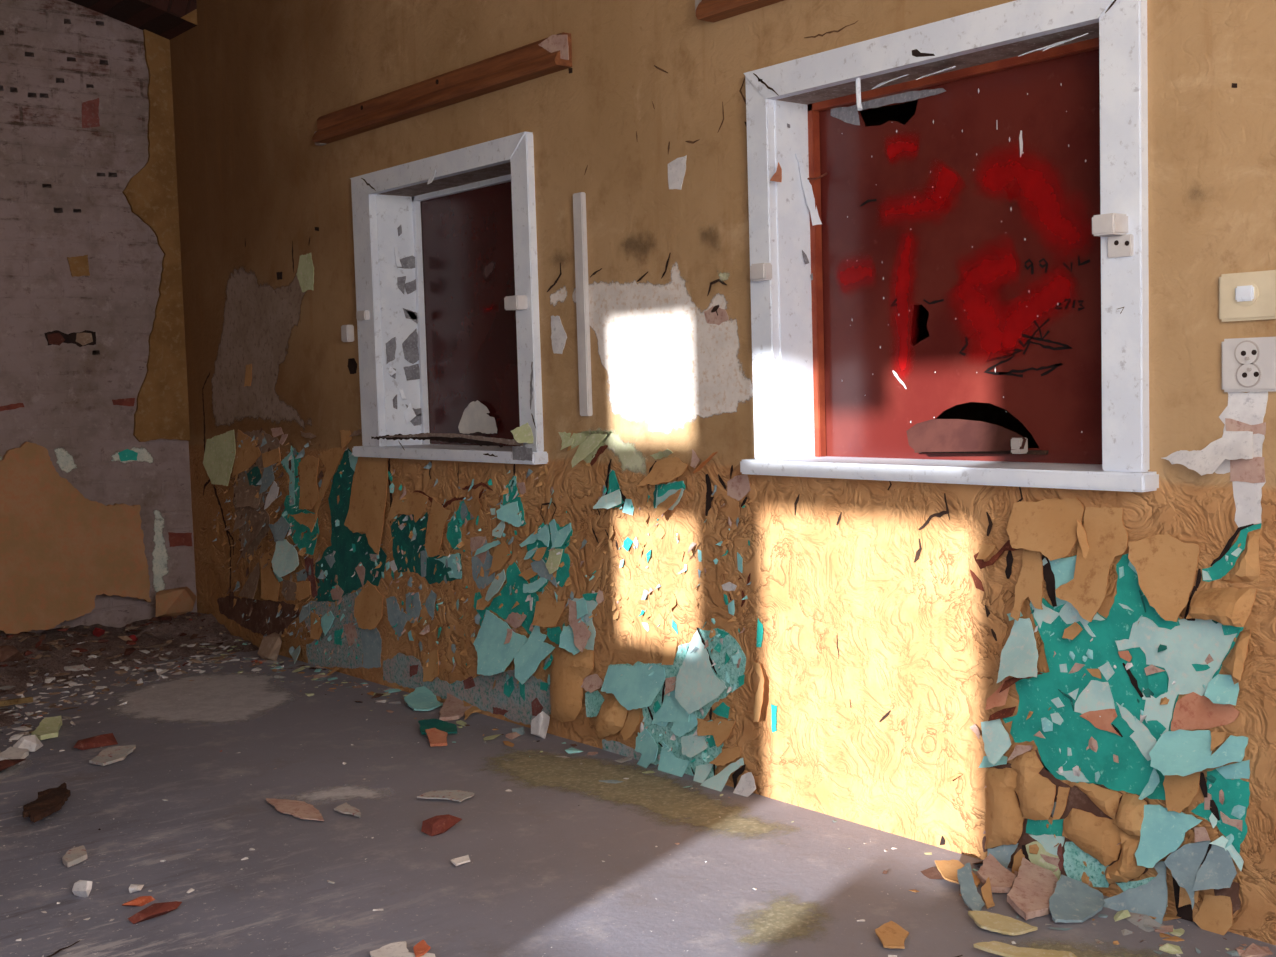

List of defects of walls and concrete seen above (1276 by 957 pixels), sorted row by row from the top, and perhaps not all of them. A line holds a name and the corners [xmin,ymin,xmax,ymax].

flaking render [81,98,100,128]
spalling [44,330,96,347]
peeling [54,448,77,473]
peeling [111,447,153,464]
peeling [203,253,777,797]
peeling [152,510,192,592]
peeling [970,392,1268,935]
peeling [417,790,474,802]
peeling [334,802,361,818]